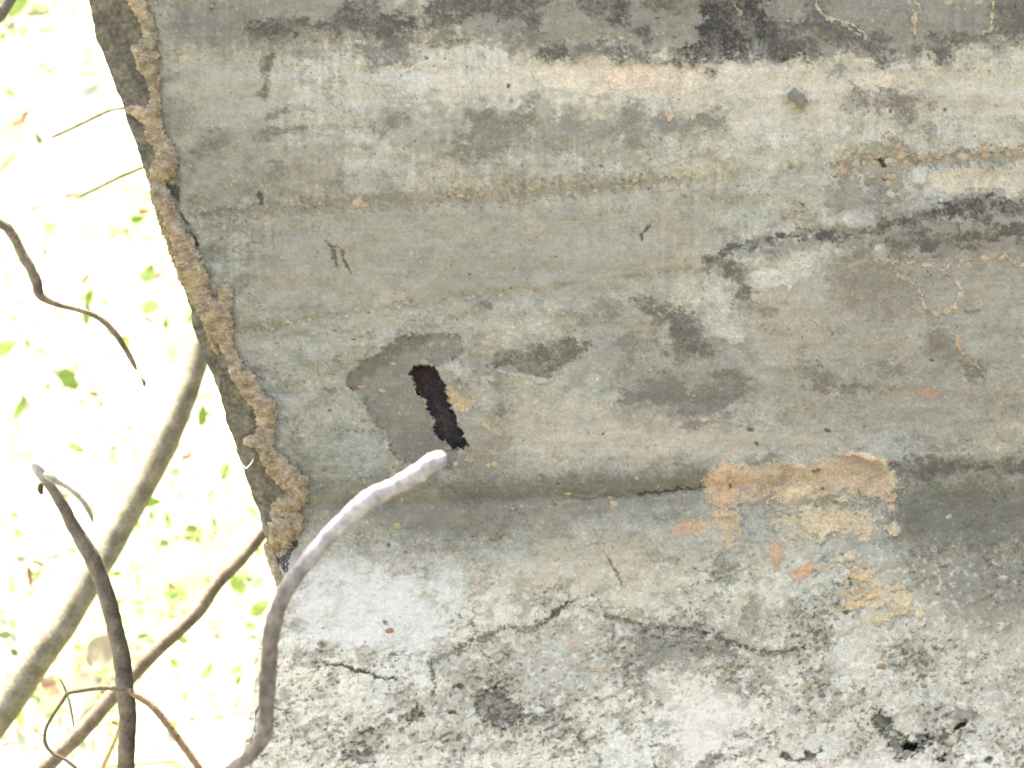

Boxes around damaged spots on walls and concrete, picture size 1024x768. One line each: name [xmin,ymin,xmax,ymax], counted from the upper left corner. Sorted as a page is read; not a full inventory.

damp [157,0,1024,189]
damp [481,189,1024,434]
spalling [338,322,520,495]
peeling [799,492,865,544]
peeling [883,517,901,538]
crack [312,663,397,681]
crack [427,601,572,695]
crack [604,613,812,657]